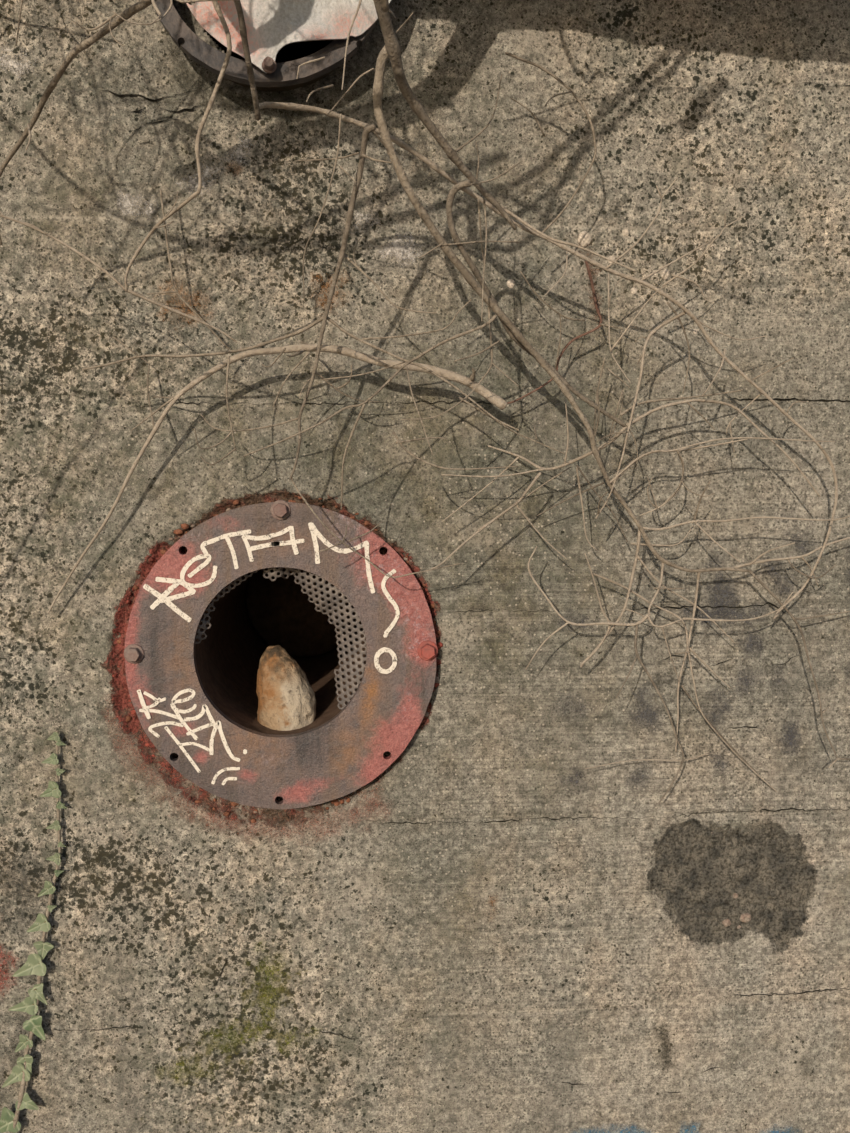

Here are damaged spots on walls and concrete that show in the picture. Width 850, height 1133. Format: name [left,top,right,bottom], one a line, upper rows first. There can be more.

crack [733,396,850,404]
crack [383,808,850,824]